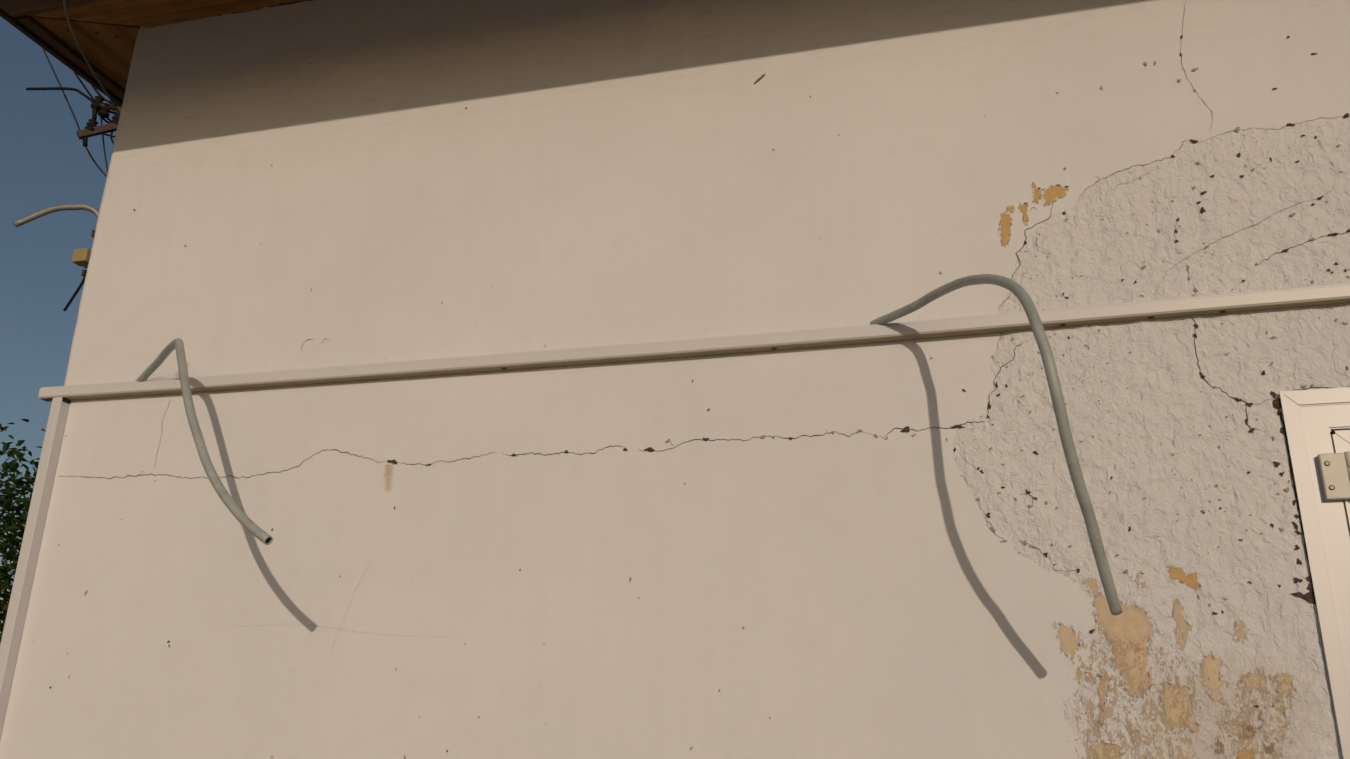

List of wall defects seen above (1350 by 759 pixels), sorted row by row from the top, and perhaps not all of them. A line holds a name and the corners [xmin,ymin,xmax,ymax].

crack [64,0,1350,481]
peeling [998,167,1069,247]
peeling [1051,554,1300,759]
crack [1191,317,1335,681]